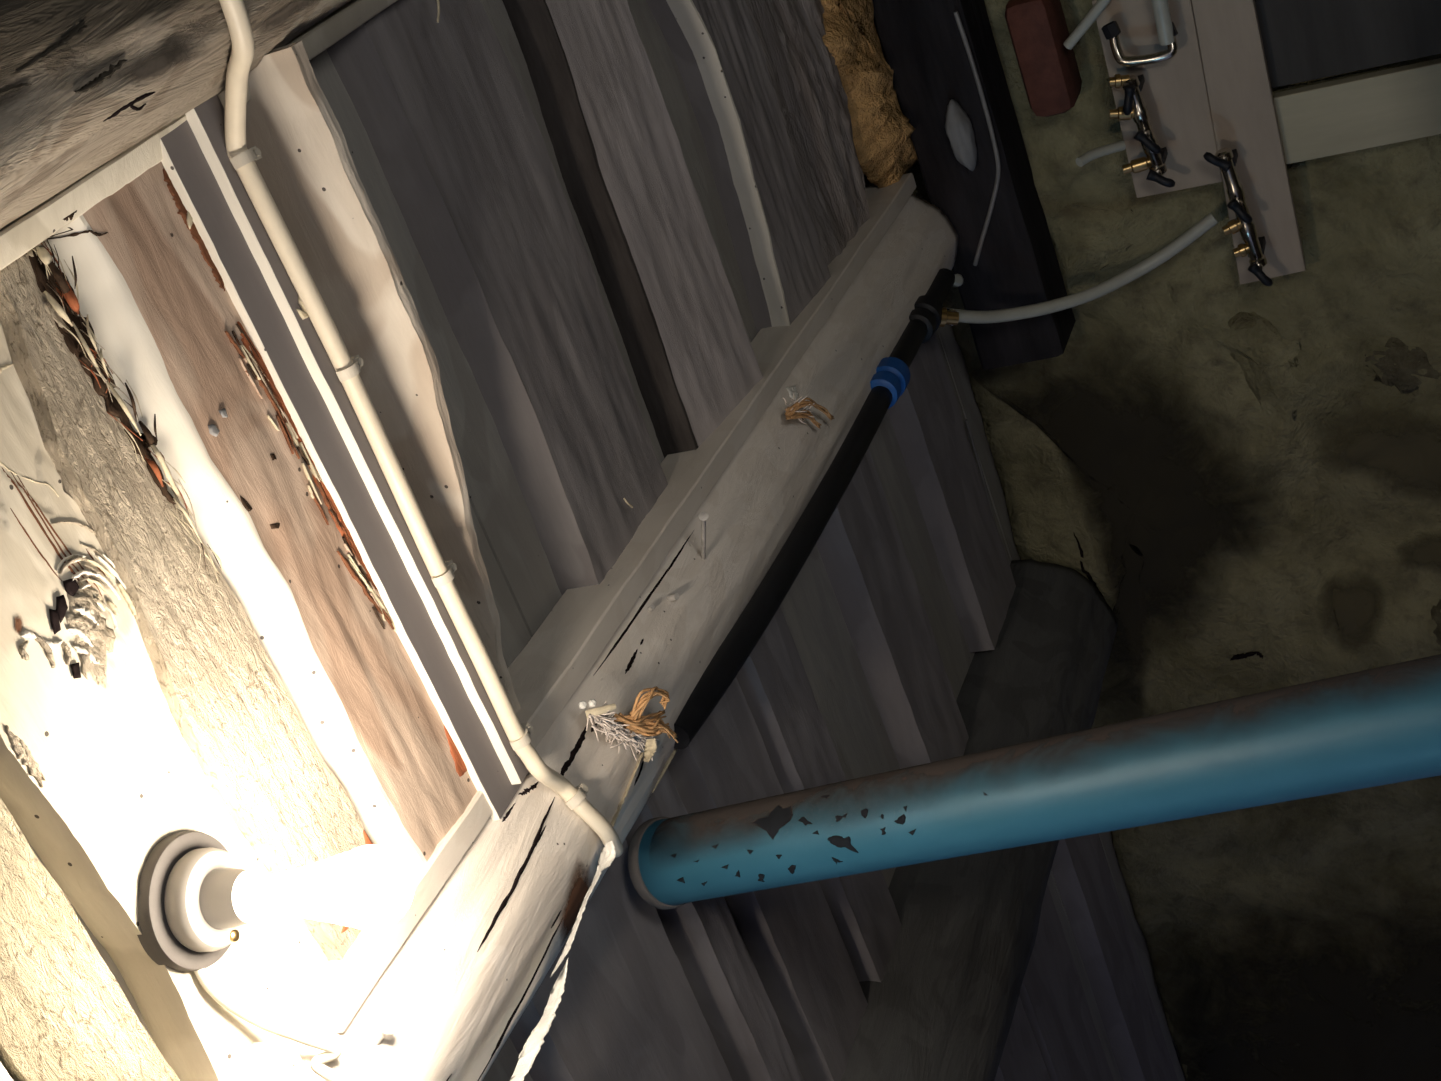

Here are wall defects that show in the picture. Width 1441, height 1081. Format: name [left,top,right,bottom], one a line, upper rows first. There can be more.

crack [477,723,597,952]
peeling [753,805,812,840]
peeling [827,808,906,864]